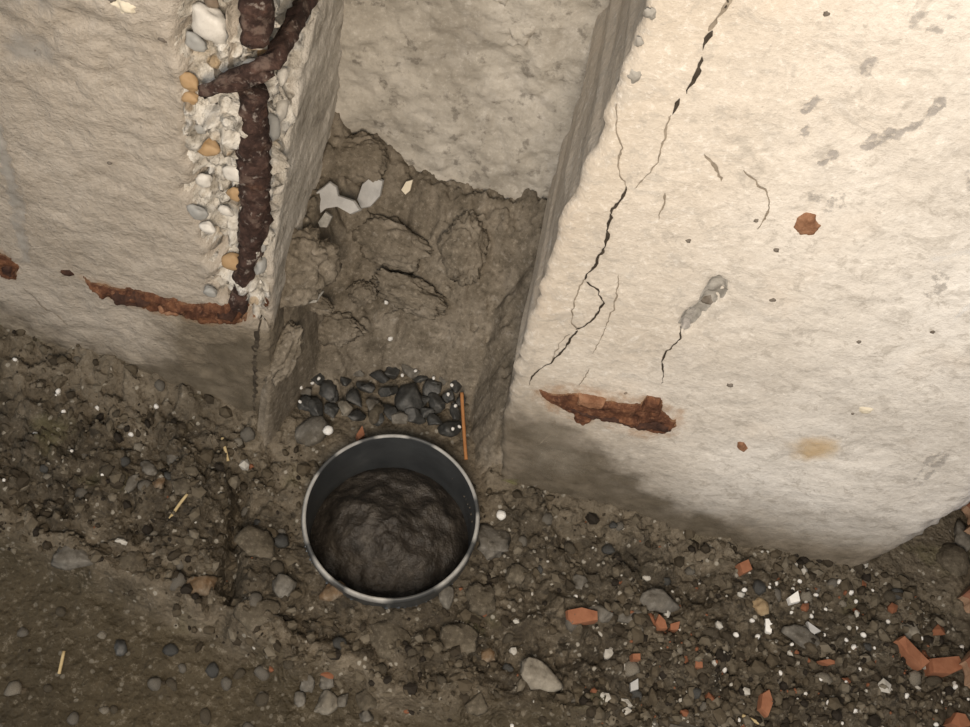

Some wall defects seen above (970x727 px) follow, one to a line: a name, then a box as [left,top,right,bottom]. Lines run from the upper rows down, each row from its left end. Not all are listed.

spalling [158,0,320,320]
spalling [316,179,384,227]
spalling [401,180,413,195]
crack [529,0,733,385]
crack [704,155,770,229]
corrosion [794,212,821,235]
corrosion [0,253,19,280]
corrosion [60,270,269,325]
corrosion [539,389,677,434]